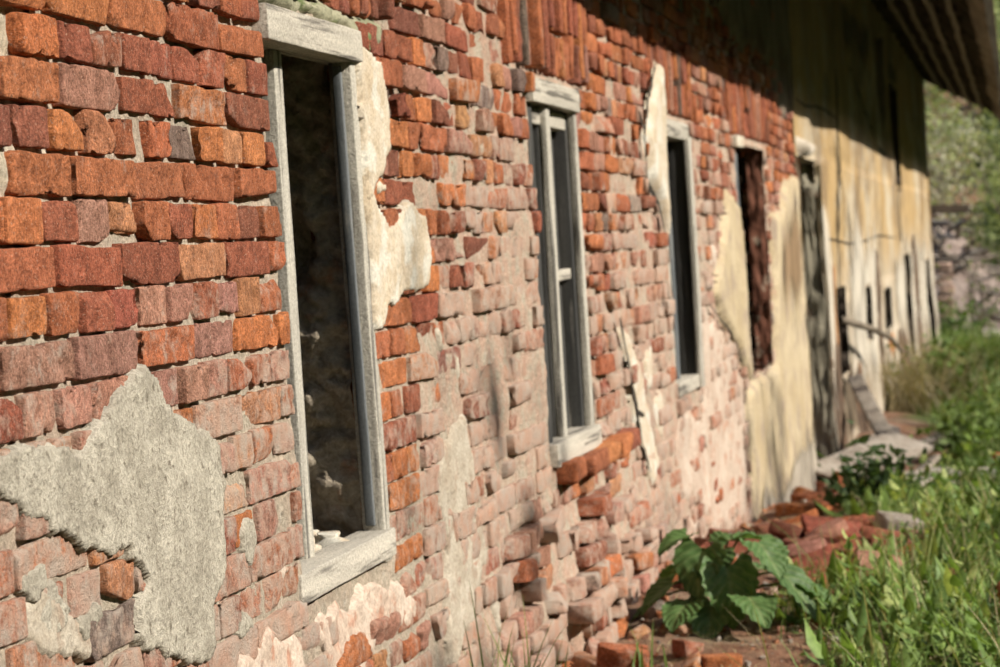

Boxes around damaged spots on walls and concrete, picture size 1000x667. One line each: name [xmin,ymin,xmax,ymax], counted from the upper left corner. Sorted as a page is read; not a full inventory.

peeling [355,47,432,331]
peeling [642,61,671,249]
crack [796,9,896,286]
peeling [0,364,257,667]
spalling [313,530,350,552]
spalling [336,532,431,667]
spalling [551,326,664,508]
peeling [676,174,814,533]